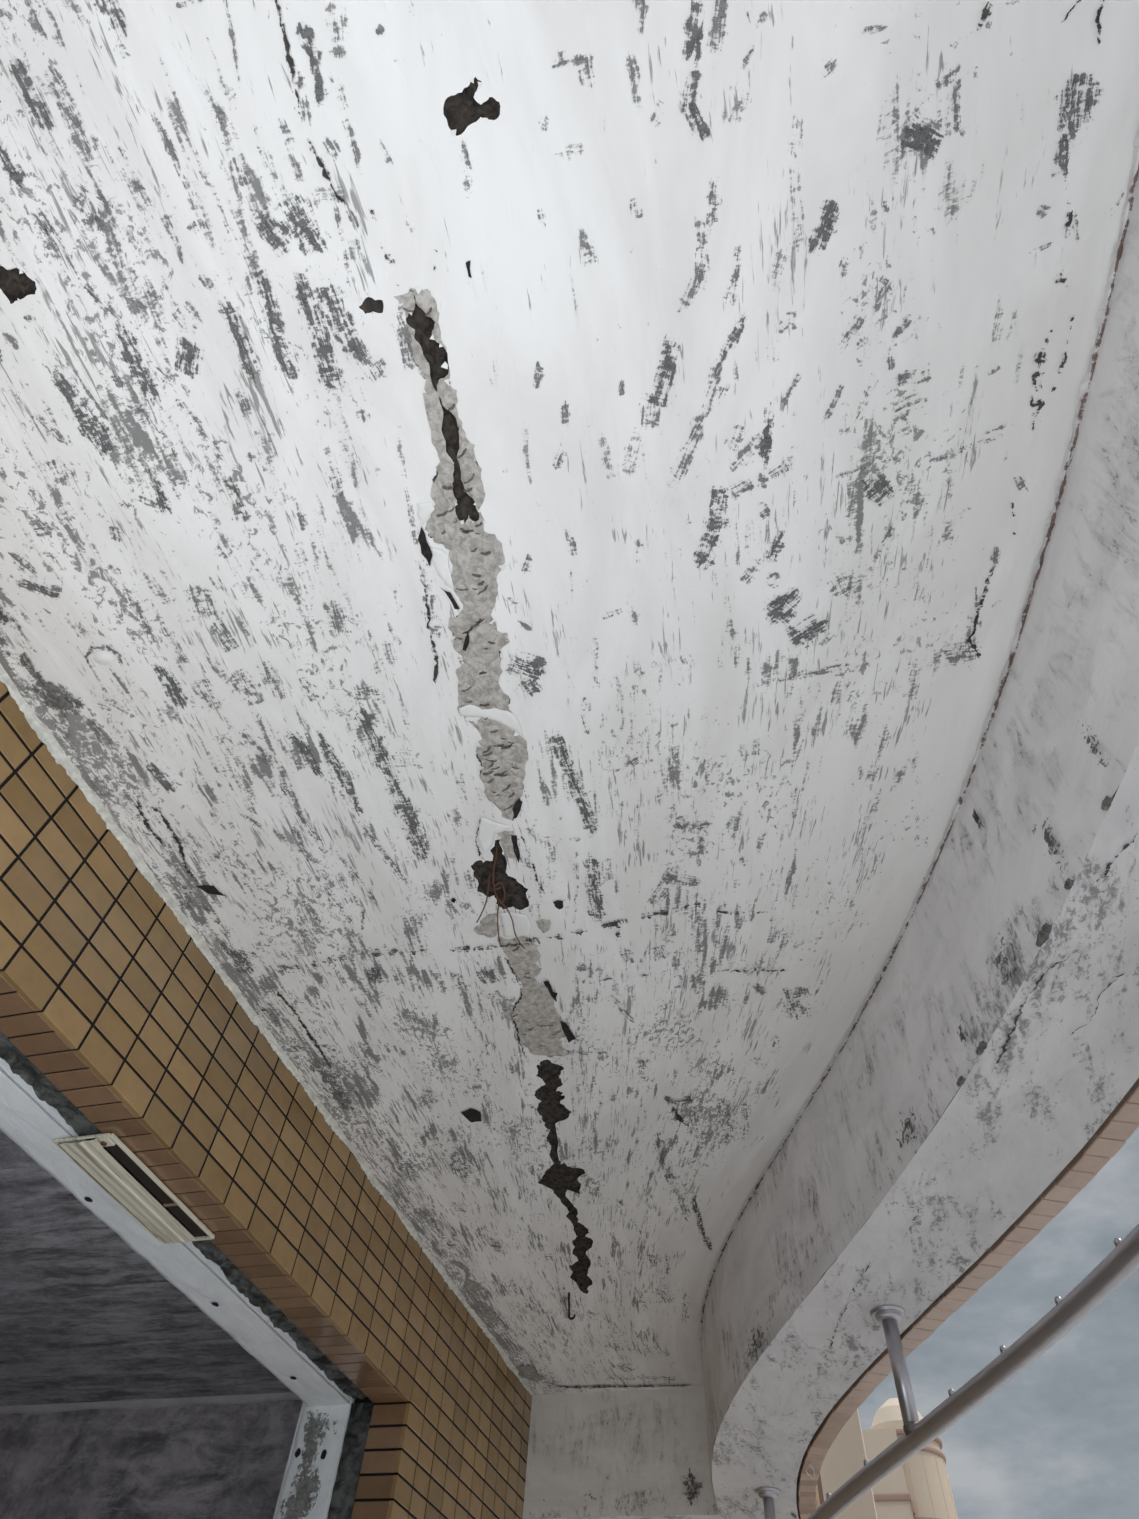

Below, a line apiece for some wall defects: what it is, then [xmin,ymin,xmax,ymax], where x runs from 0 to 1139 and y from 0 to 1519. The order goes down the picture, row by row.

crack [1062,0,1104,44]
spalling [443,77,500,137]
spalling [0,266,37,304]
peeling [0,607,86,718]
crack [545,125,1139,1389]
spalling [471,839,529,910]
crack [255,903,768,1068]